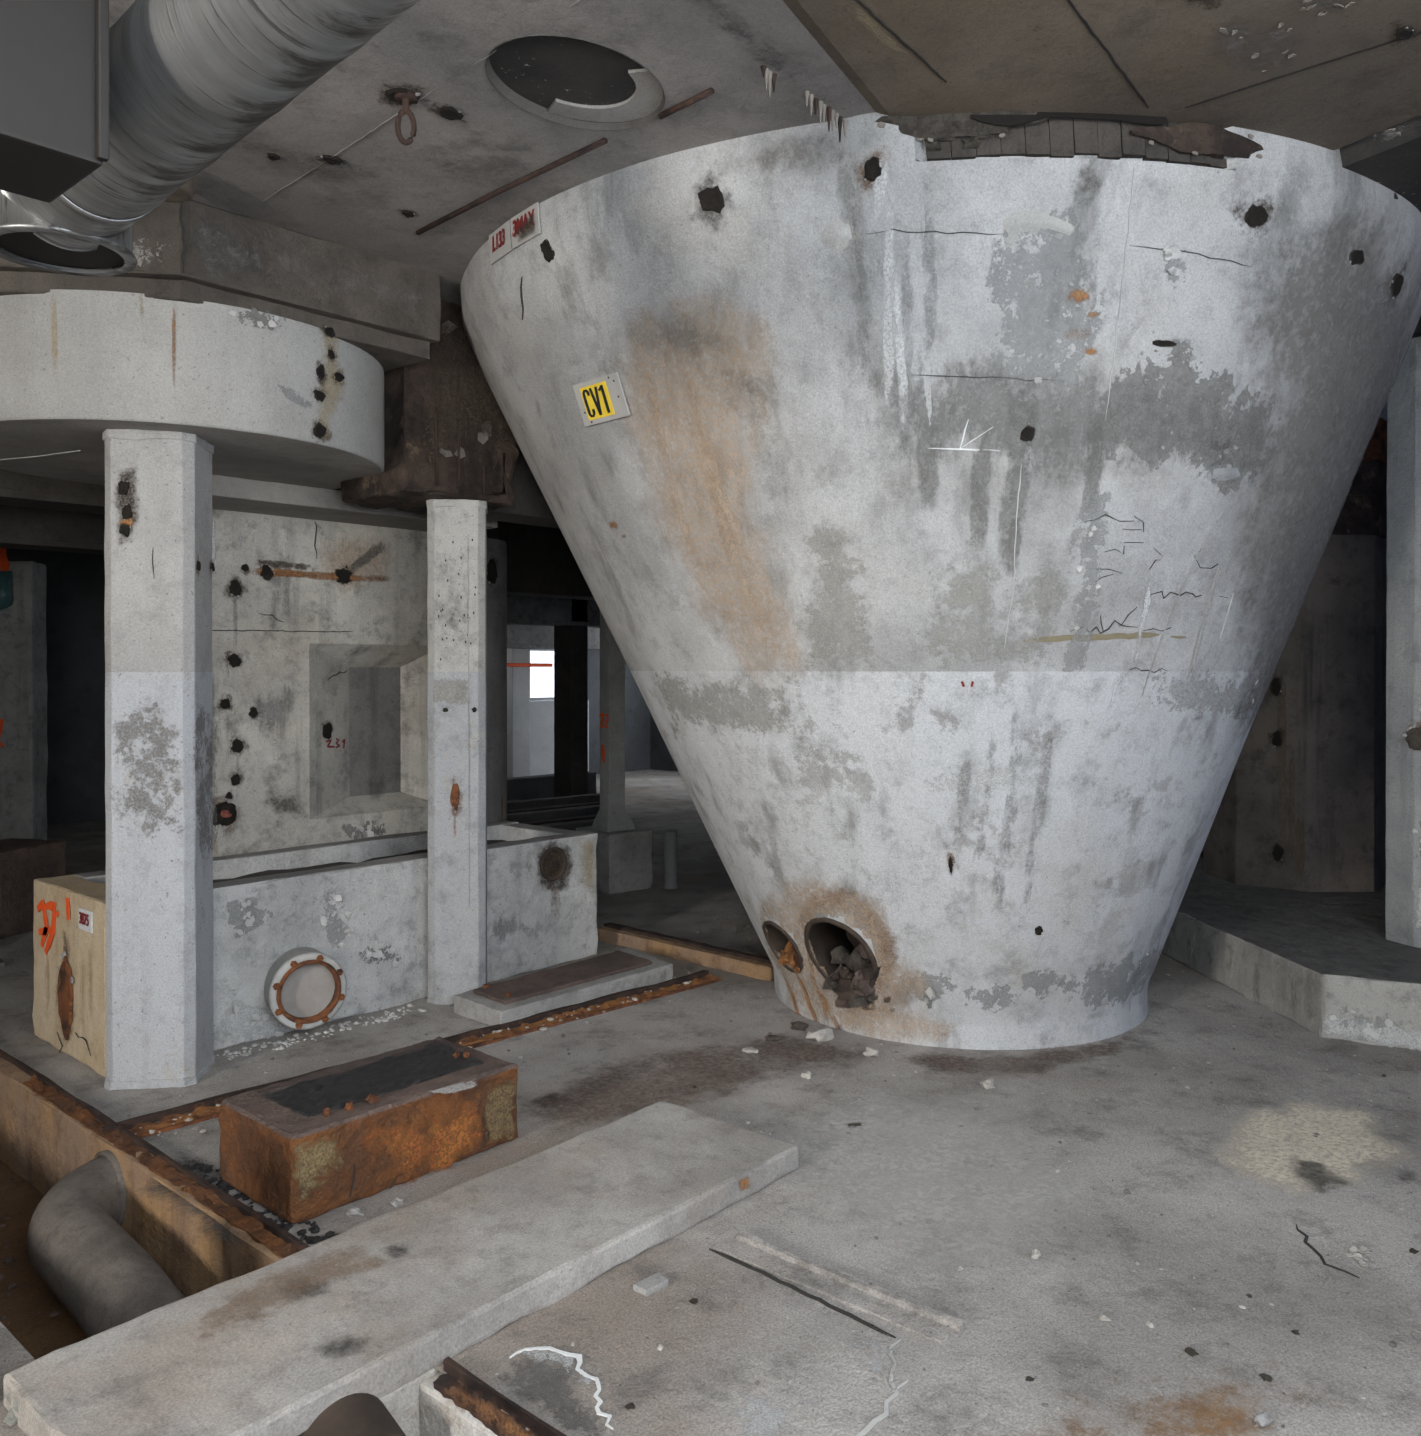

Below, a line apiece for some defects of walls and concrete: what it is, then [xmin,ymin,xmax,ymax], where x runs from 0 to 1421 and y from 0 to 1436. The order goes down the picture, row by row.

spalling [875,111,1049,153]
spalling [1131,121,1264,160]
spalling [278,326,345,442]
damp [873,163,1264,680]
rust [257,543,385,581]
crack [1023,514,1227,673]
rust [761,887,924,1029]
rust [23,1074,299,1258]
rust [293,1137,340,1200]
rust [364,1081,516,1182]
crack [1296,1224,1359,1278]
peeling [509,1346,613,1430]